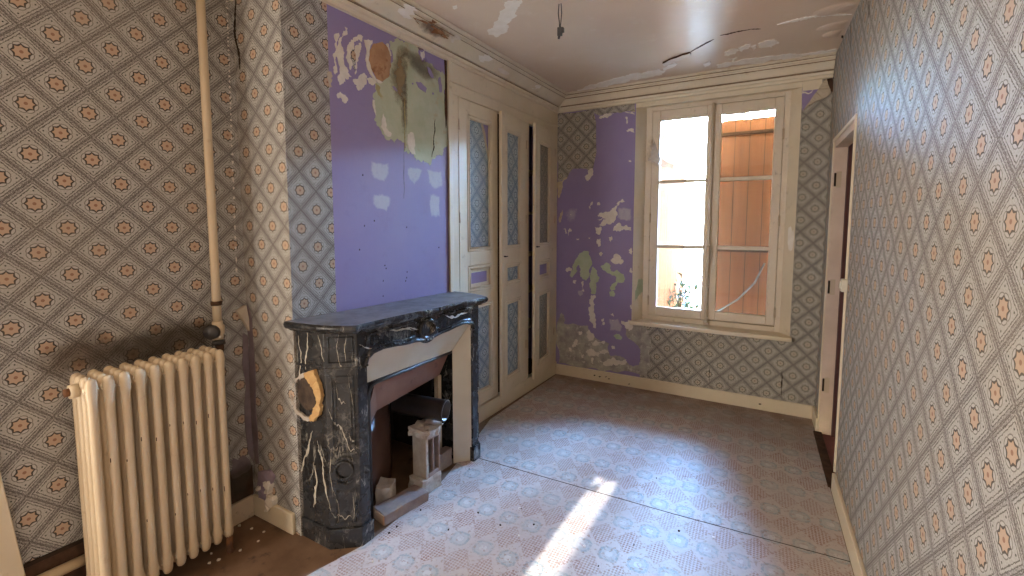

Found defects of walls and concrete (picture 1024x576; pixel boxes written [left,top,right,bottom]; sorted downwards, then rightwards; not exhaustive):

crack [232,0,240,68]
peeling [487,0,522,37]
crack [690,28,758,53]
peeling [372,38,447,165]
leakage [393,54,433,150]
peeling [559,210,631,256]
peeling [569,304,633,379]